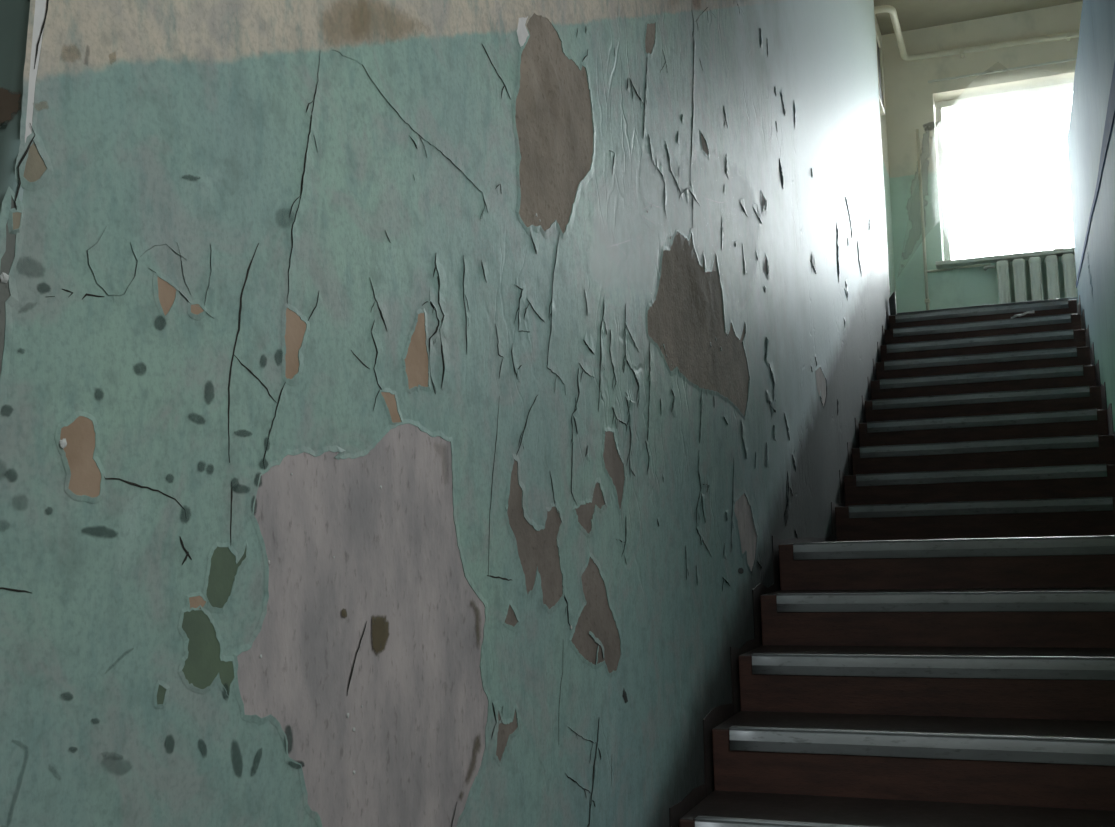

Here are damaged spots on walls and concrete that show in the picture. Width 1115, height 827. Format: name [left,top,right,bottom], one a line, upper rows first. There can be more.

crack [0,586,32,594]
spalling [0,0,54,427]
peeling [55,411,106,503]
crack [104,477,183,508]
crack [228,243,289,539]
peeling [153,253,521,827]
crack [351,276,389,413]
crack [287,46,503,304]
peeling [512,9,597,254]
peeling [502,395,627,677]
peeling [646,227,751,421]